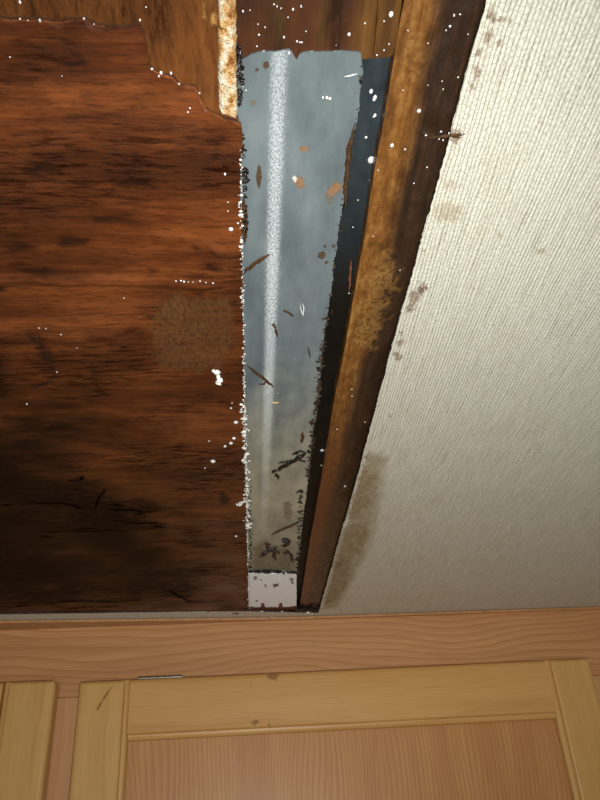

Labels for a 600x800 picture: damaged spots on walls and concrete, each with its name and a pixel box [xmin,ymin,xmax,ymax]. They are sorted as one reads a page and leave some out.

spalling [300,307,333,541]